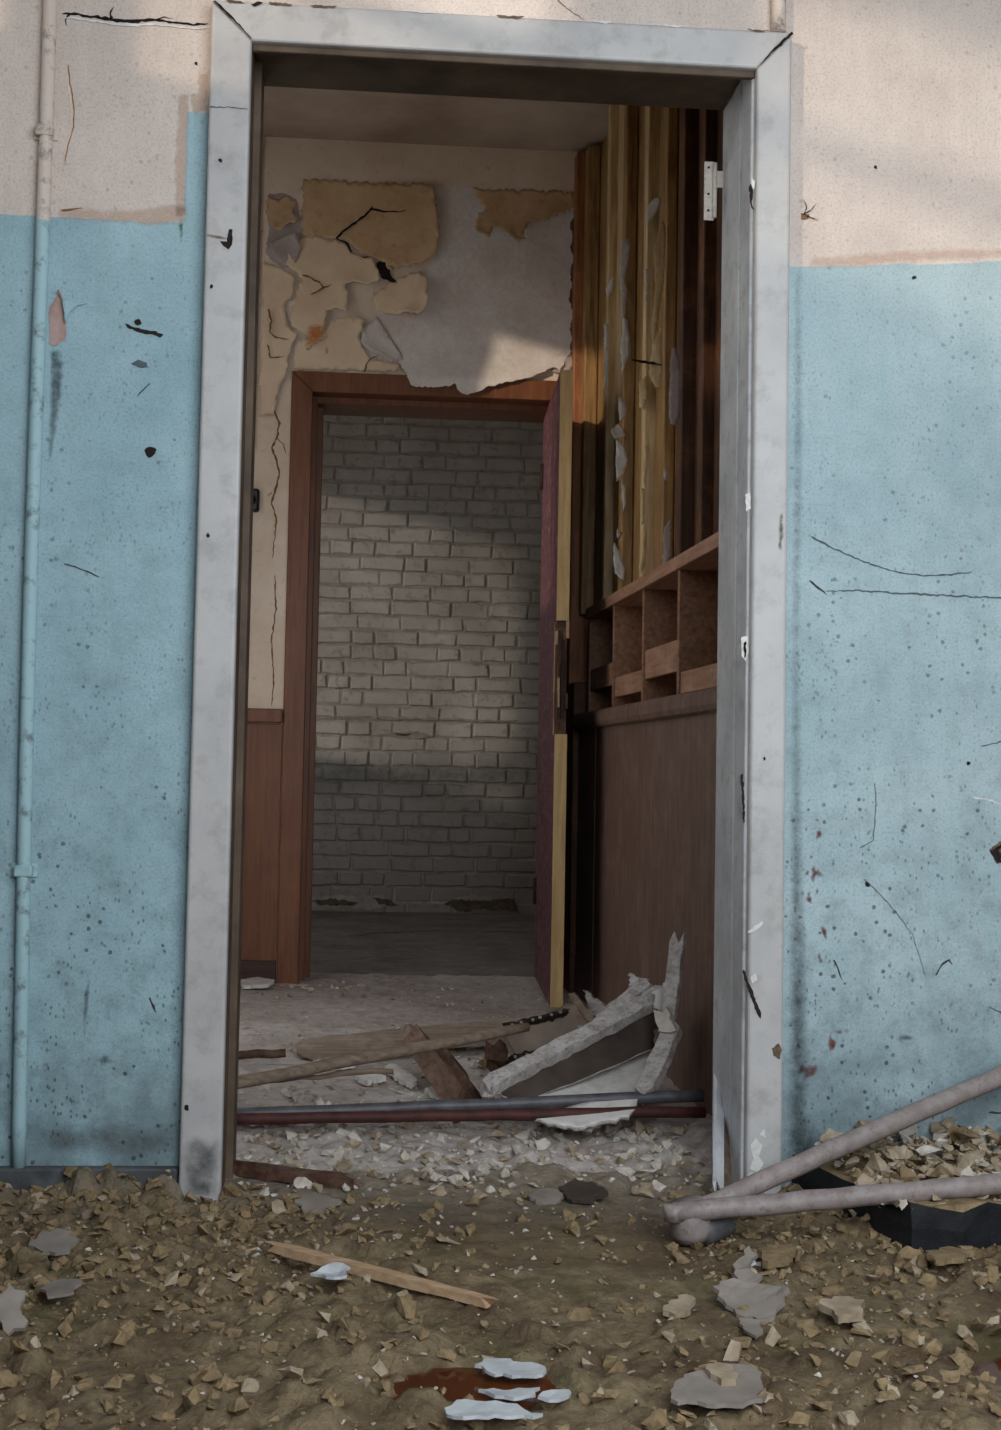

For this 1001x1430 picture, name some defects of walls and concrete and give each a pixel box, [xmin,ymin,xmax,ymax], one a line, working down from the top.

crack [62,1,252,39]
peeling [259,178,574,416]
crack [269,410,286,706]
crack [812,536,1001,599]